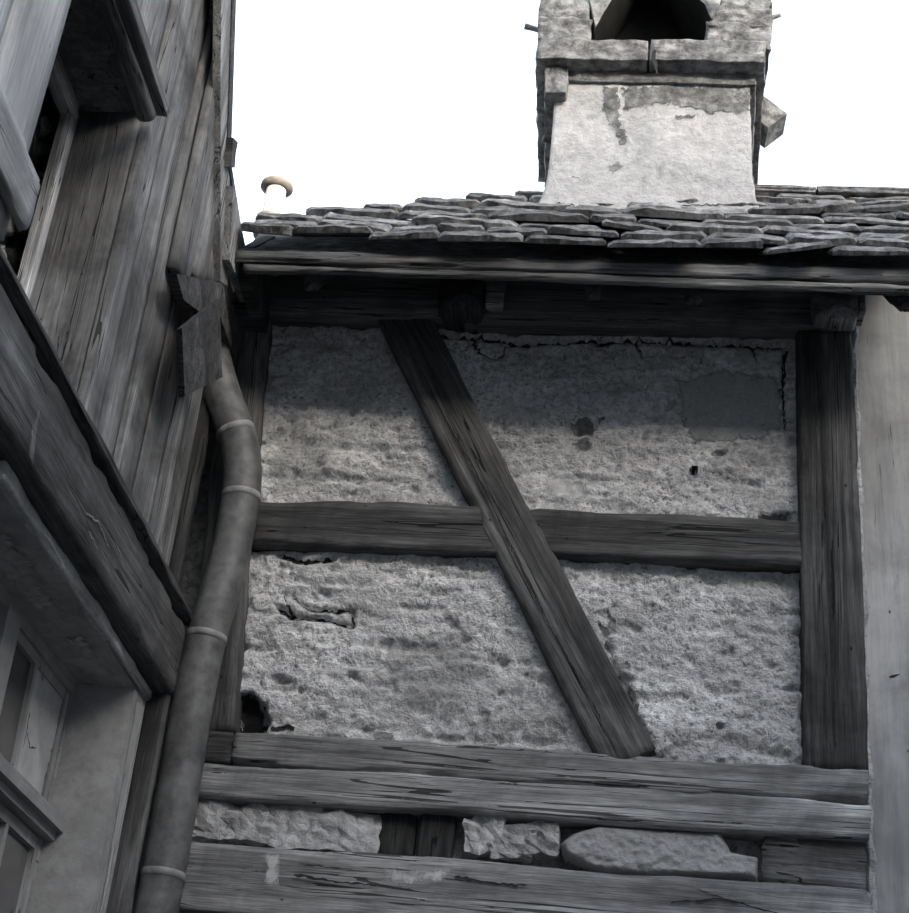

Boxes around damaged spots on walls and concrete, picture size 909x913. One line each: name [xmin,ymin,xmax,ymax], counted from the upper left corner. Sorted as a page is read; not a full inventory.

flaking render [240,690,295,733]
crack [429,390,602,721]
crack [441,334,789,432]
crack [812,346,837,746]